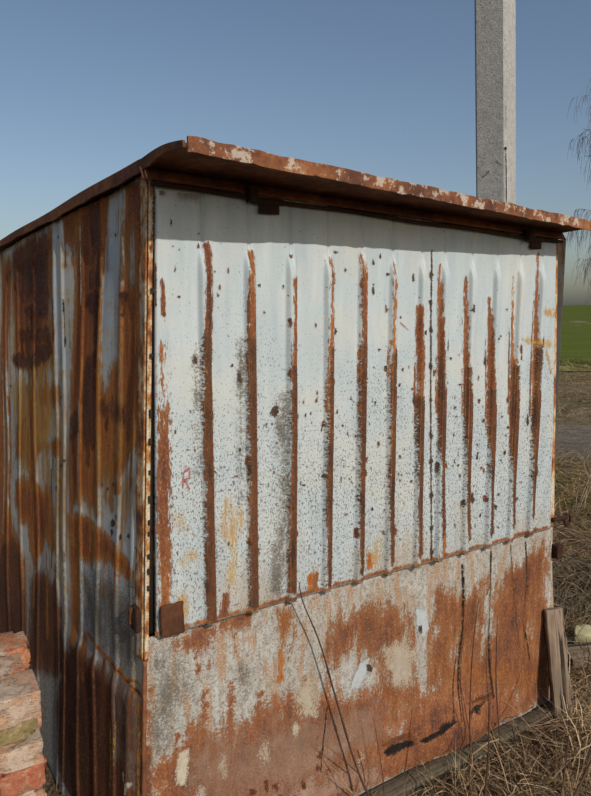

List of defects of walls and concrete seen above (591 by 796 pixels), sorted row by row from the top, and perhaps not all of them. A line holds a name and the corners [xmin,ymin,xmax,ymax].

rust [0,181,555,796]